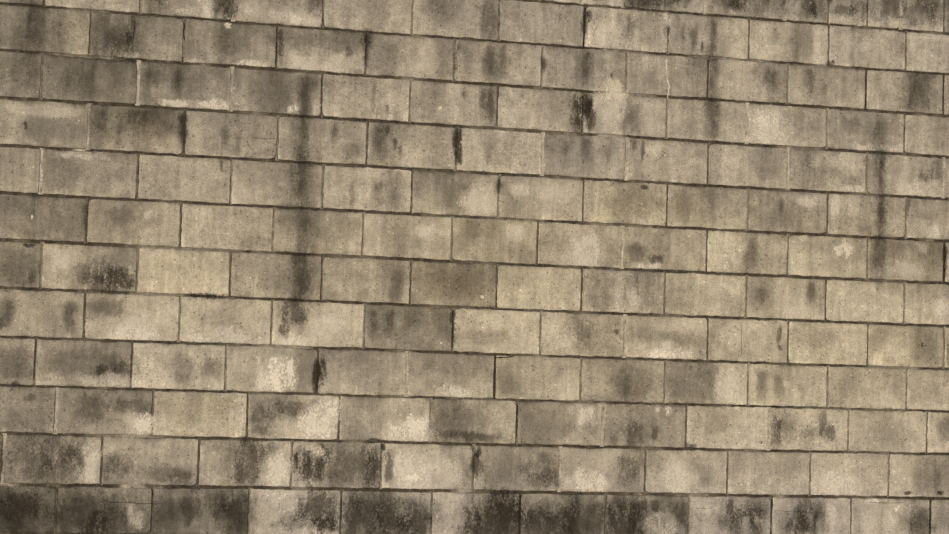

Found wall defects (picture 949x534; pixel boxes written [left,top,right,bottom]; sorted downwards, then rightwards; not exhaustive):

water stain [571,74,628,132]
water stain [452,129,462,163]
water stain [107,269,133,290]
water stain [84,447,100,481]
water stain [381,413,430,488]
water stain [565,467,607,492]
water stain [820,470,855,495]
water stain [378,497,431,534]
water stain [475,491,523,534]
water stain [608,501,658,534]
water stain [730,509,765,533]